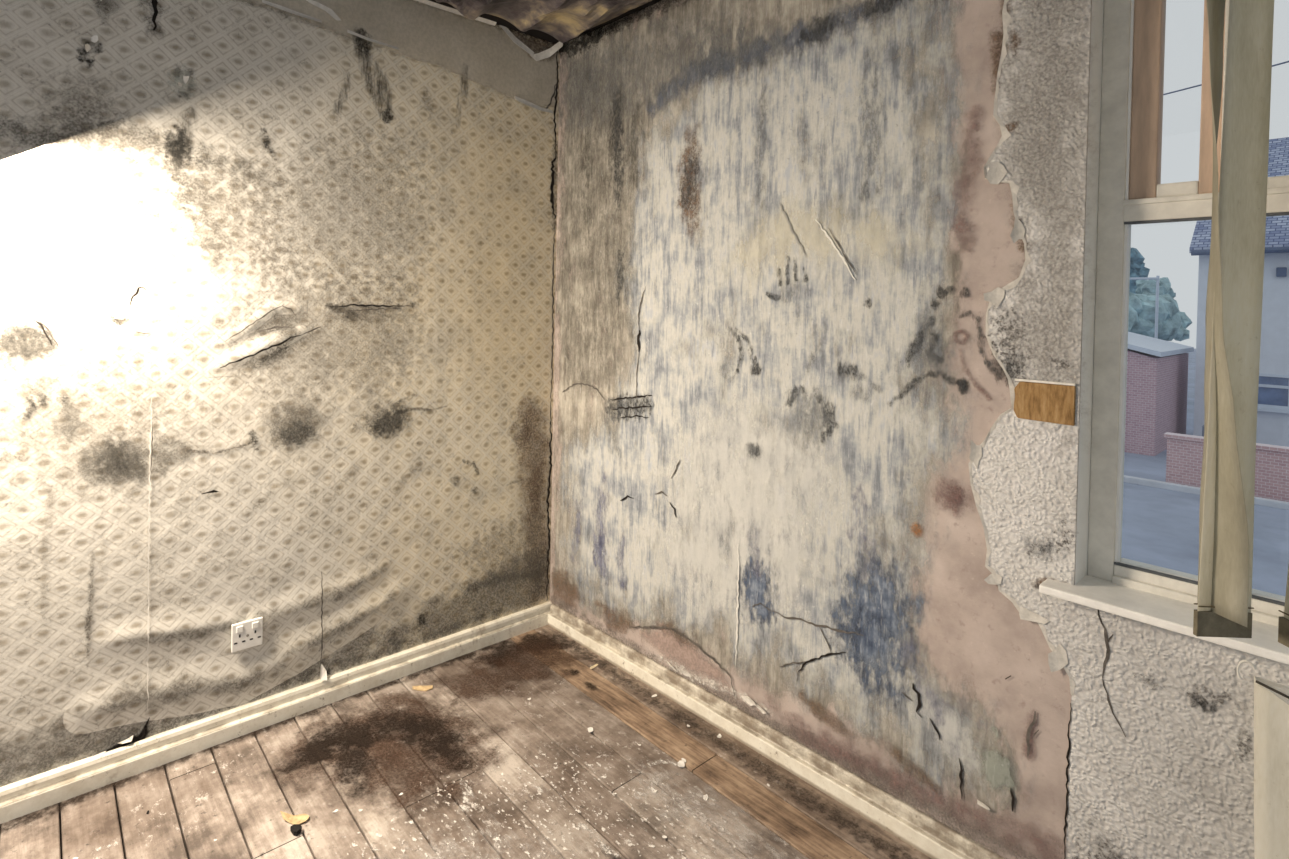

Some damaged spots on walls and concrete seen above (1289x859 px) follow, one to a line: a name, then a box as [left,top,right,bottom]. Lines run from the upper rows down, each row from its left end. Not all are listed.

peeling [262,0,399,50]
leakage [245,0,688,123]
leakage [0,109,247,259]
leakage [678,132,700,236]
leakage [0,318,58,362]
leakage [992,308,1026,380]
leakage [21,381,51,419]
peeling [415,0,1019,815]
leakage [81,440,187,483]
crack [1098,610,1126,737]
crack [1008,787,1016,811]
crack [1023,703,1072,859]